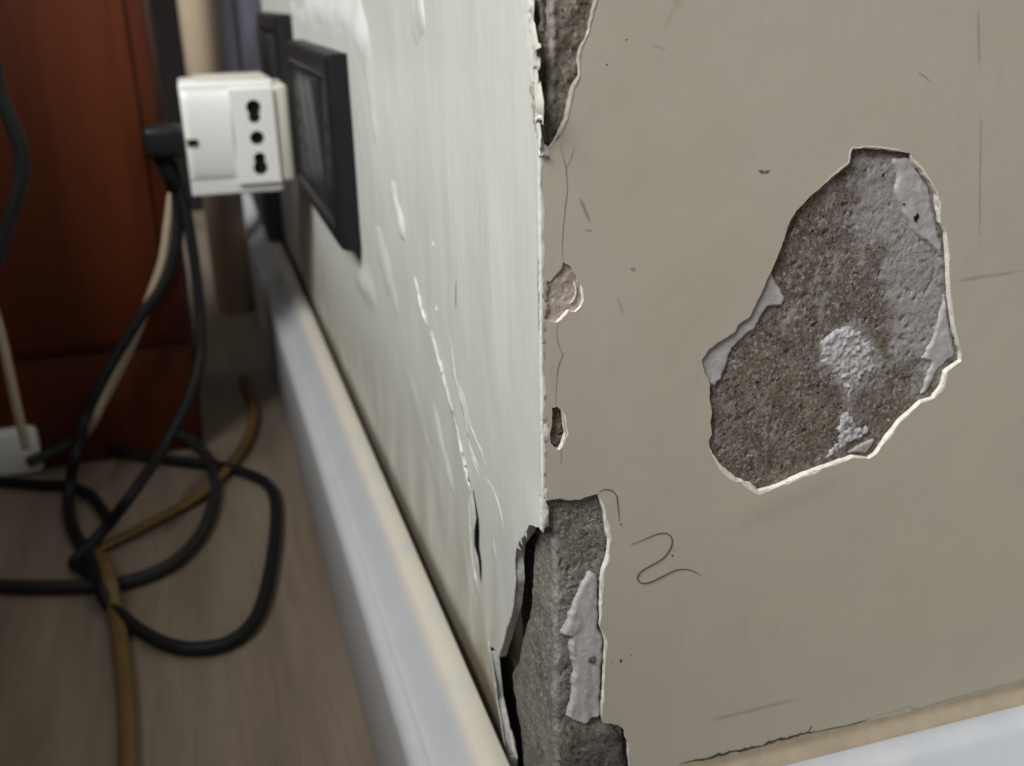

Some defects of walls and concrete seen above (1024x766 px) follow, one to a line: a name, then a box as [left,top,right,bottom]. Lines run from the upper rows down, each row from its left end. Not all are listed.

crack [414,276,504,593]
spalling [488,0,628,766]
flaking render [701,146,962,495]